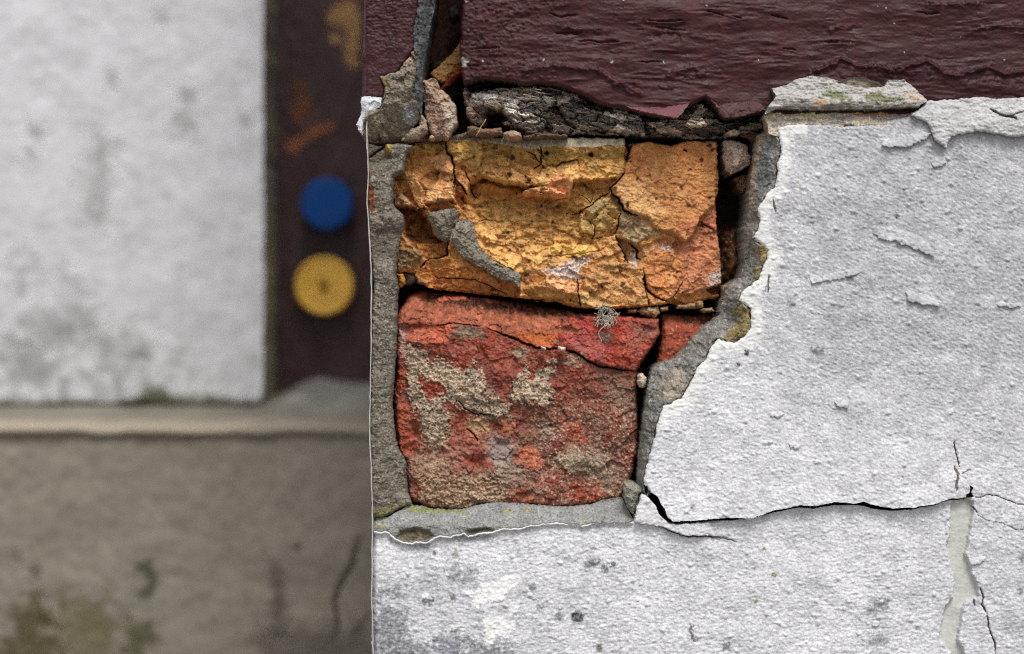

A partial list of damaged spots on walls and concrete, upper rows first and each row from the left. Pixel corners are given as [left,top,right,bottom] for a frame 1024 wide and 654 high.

peeling [356,96,382,135]
crack [445,142,478,199]
crack [526,147,577,170]
crack [576,140,681,305]
crack [420,246,508,295]
spalling [373,76,1024,545]
crack [648,492,736,541]
crack [773,502,919,511]
crack [951,442,1024,530]
crack [973,588,996,653]